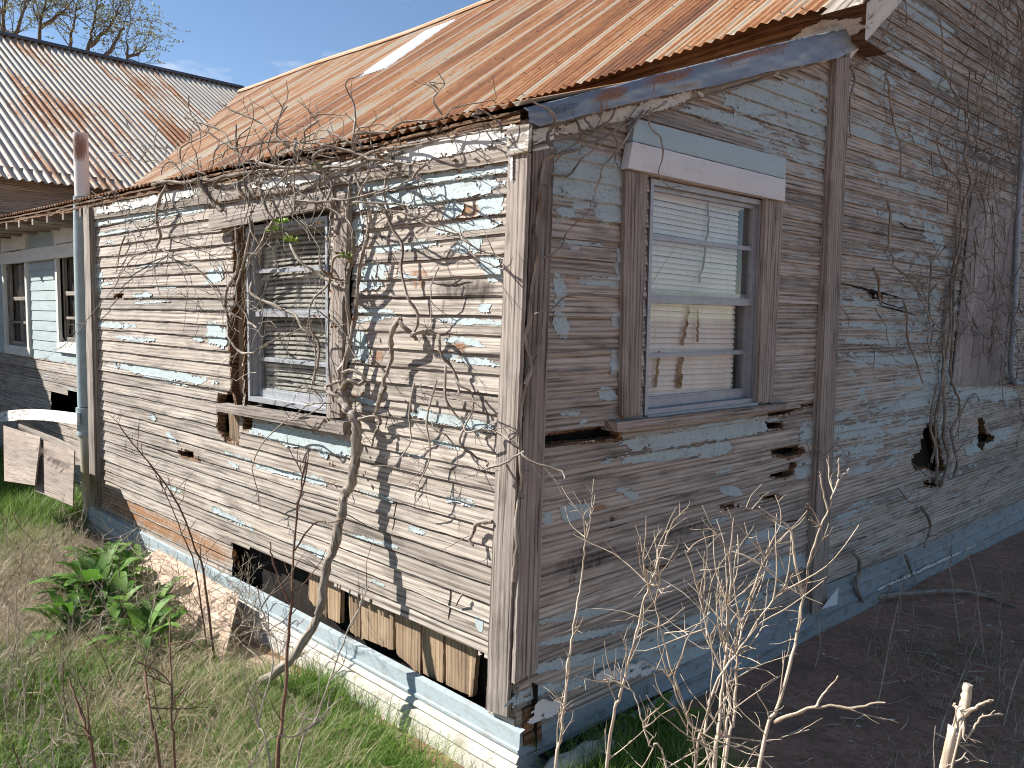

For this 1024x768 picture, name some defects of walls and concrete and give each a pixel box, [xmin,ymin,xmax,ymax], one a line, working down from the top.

corrosion [598,87,628,111]
corrosion [73,134,87,159]
peeling [553,78,829,227]
peeling [94,187,225,243]
peeling [252,124,516,379]
crack [841,283,916,315]
peeling [97,321,161,343]
peeling [109,361,234,414]
peeling [249,421,351,459]
peeling [410,408,493,435]
peeling [600,411,783,497]
spalling [896,391,936,485]